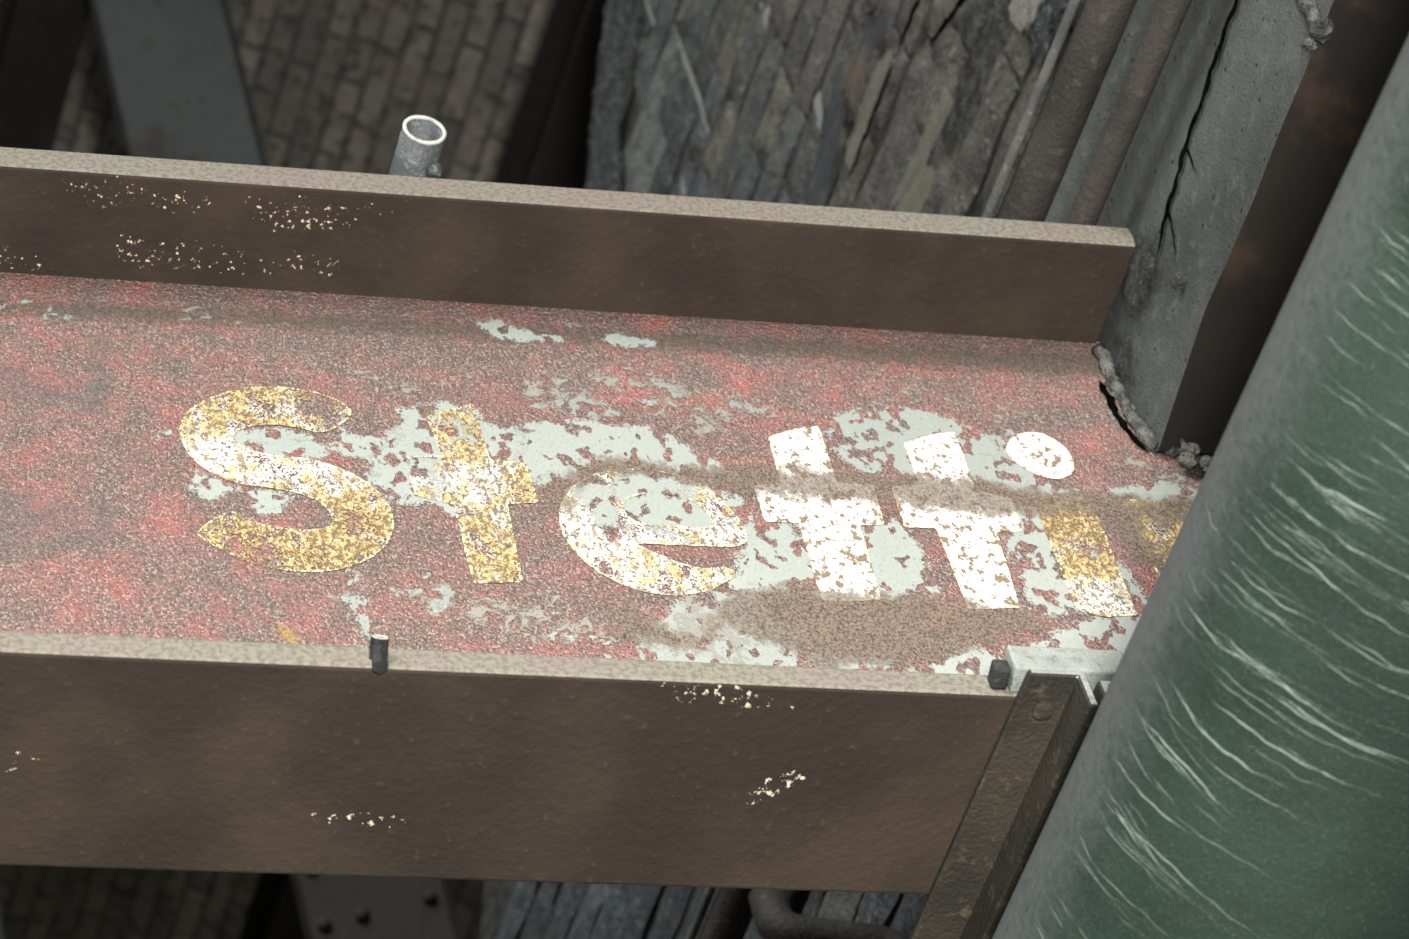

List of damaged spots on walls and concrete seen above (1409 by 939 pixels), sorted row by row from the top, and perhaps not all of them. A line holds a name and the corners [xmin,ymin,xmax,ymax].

crack [1156,0,1239,271]
peeling [157,305,352,330]
spalling [1091,344,1212,505]
peeling [185,469,295,516]
peeling [231,318,1150,675]
corrosion [542,454,1193,566]
corrosion [603,579,1047,671]